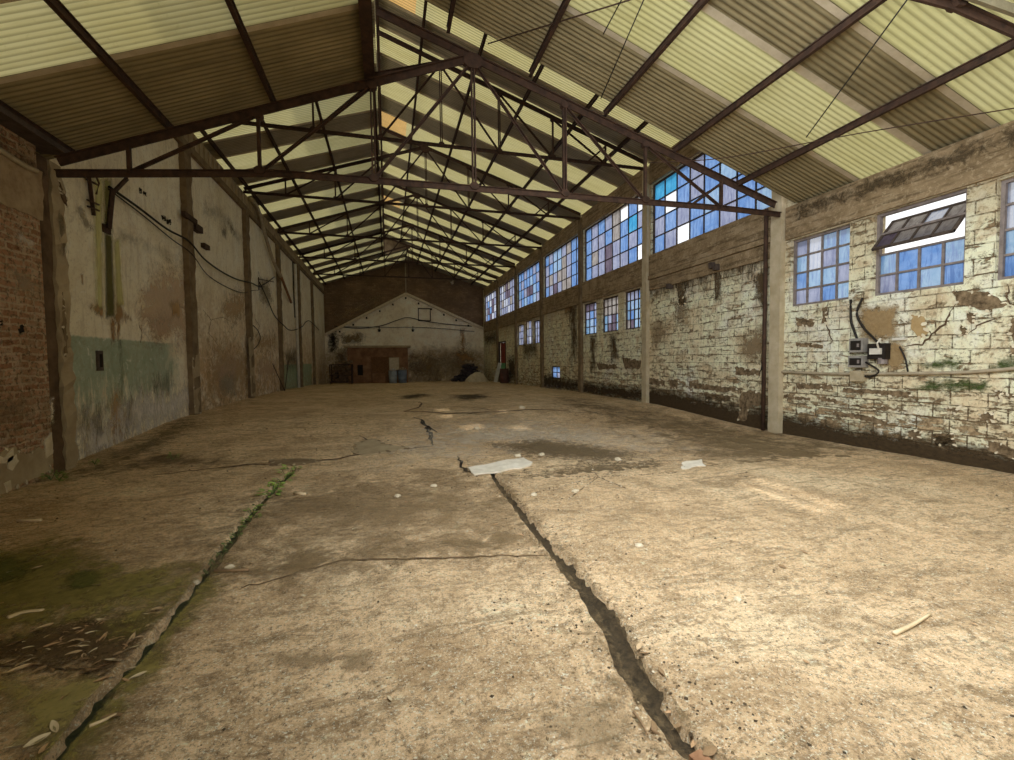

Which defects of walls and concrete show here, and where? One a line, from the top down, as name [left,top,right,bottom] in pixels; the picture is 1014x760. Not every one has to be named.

damp [610,336,618,363]
damp [651,261,768,347]
peeling [859,307,905,367]
peeling [909,312,929,341]
peeling [952,290,1007,338]
peeling [649,366,768,421]
crack [404,402,549,449]
damp [544,375,1014,474]
flaking render [0,432,54,495]
crack [154,436,366,475]